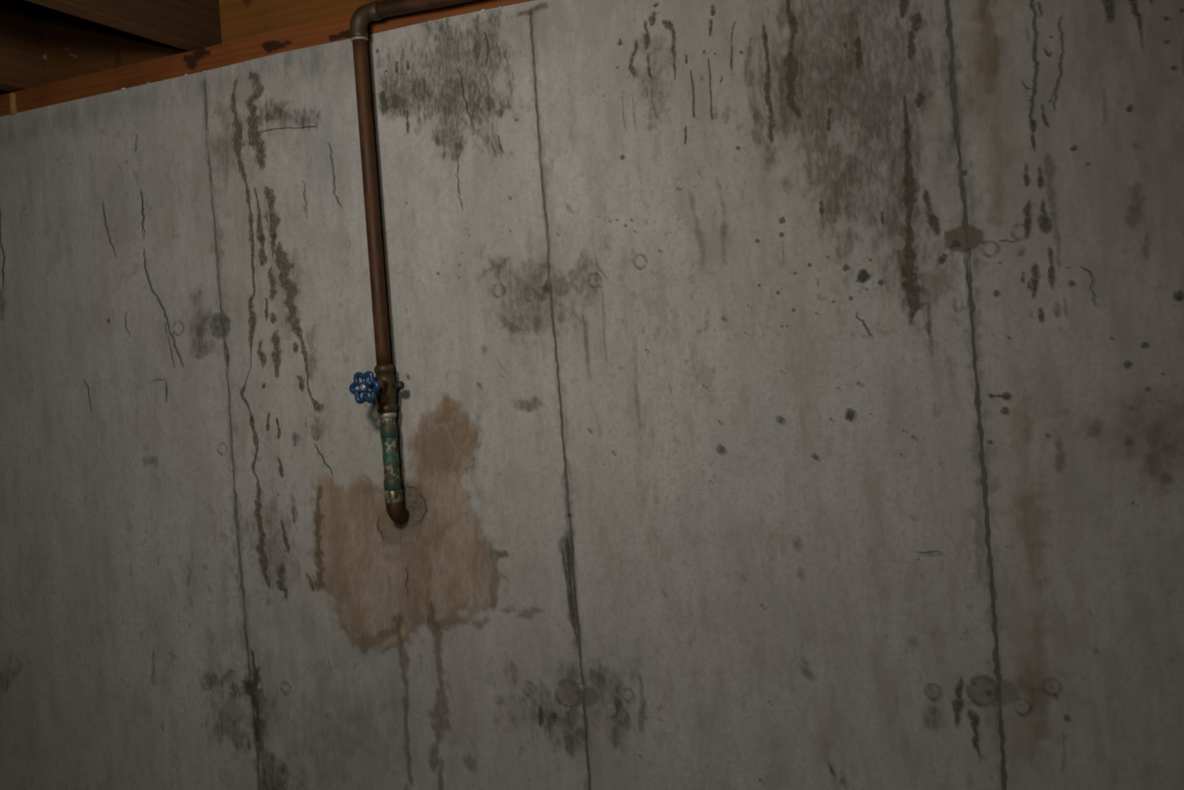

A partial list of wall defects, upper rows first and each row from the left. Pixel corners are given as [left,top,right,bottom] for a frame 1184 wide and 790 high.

damp [373,6,511,159]
damp [762,26,775,141]
damp [784,0,800,116]
damp [900,0,922,58]
crack [1022,0,1063,148]
crack [102,190,184,367]
damp [231,73,323,599]
damp [901,93,939,322]